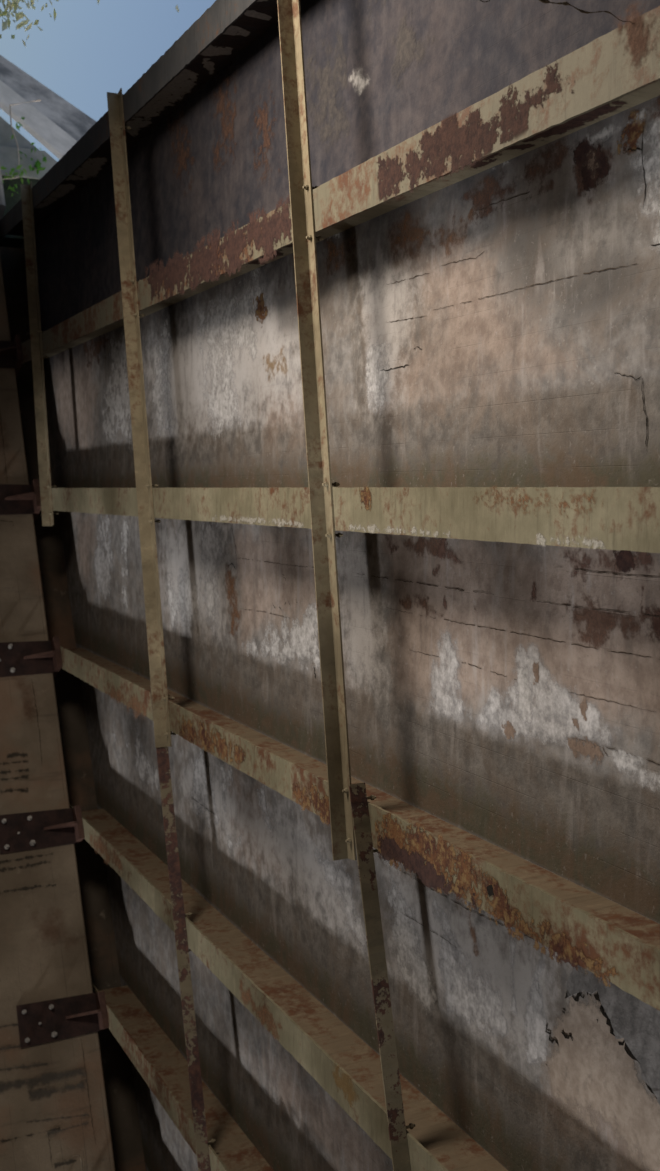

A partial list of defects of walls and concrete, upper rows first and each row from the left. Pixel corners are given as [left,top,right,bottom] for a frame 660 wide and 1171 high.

peeling [125,0,272,137]
corrosion [377,60,660,218]
corrosion [144,196,293,300]
crack [387,243,660,323]
corrosion [215,515,304,528]
corrosion [536,533,652,577]
leakage [431,632,464,720]
crack [386,607,660,660]
leakage [477,644,660,791]
corrosion [573,600,660,648]
corrosion [375,813,618,987]
spalling [541,965,660,1171]